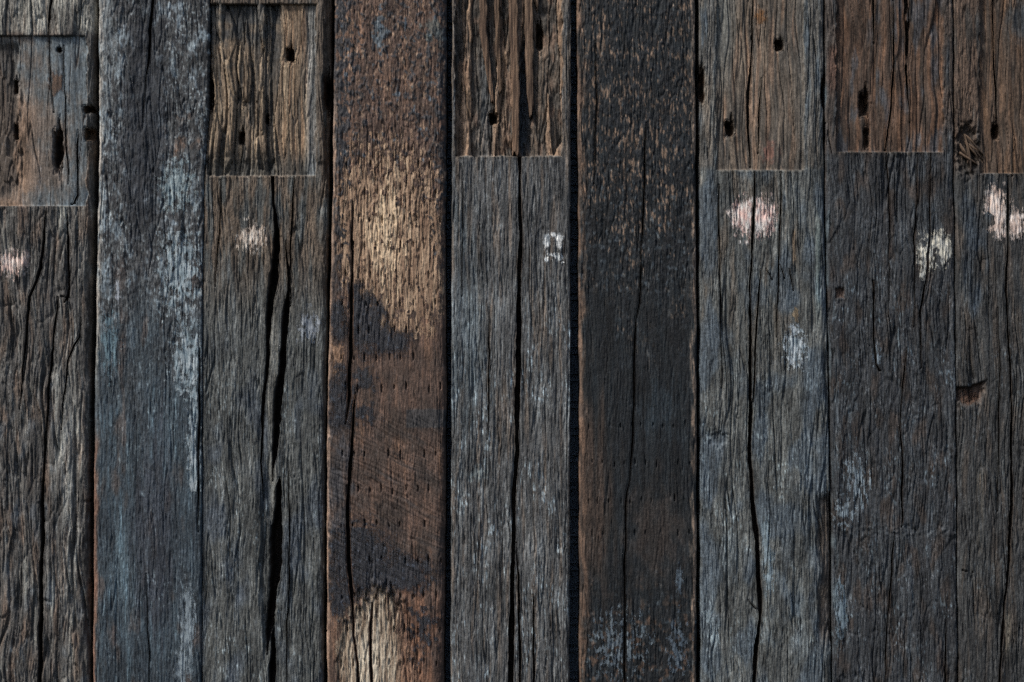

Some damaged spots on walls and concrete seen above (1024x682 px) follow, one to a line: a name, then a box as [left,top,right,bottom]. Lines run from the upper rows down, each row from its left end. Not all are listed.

crack [19,0,82,682]
crack [259,176,295,682]
crack [344,201,373,682]
crack [487,157,536,682]
crack [622,123,647,682]
crack [745,0,794,682]